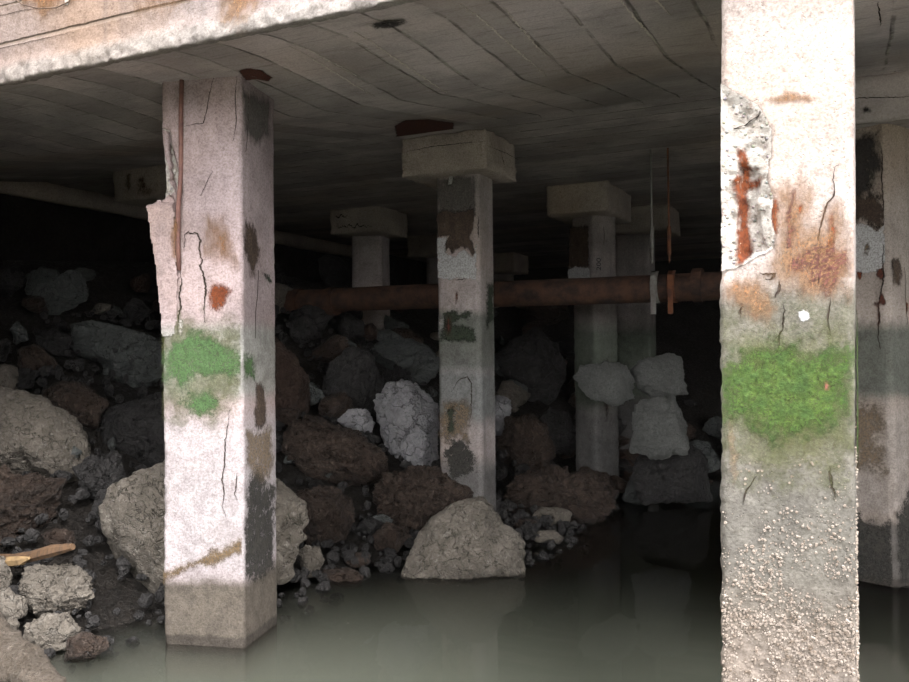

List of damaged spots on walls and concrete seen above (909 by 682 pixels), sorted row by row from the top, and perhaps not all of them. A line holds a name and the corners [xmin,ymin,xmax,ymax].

spalling [162,79,184,271]
crack [177,231,207,332]
corrosion [208,284,231,310]
damp [436,176,475,256]
corrosion [733,149,761,265]
spalling [721,84,775,271]
corrosion [771,188,862,296]
crack [817,165,837,338]
damp [855,132,884,231]
peeling [856,223,885,275]
damp [163,383,276,583]
damp [857,490,909,586]